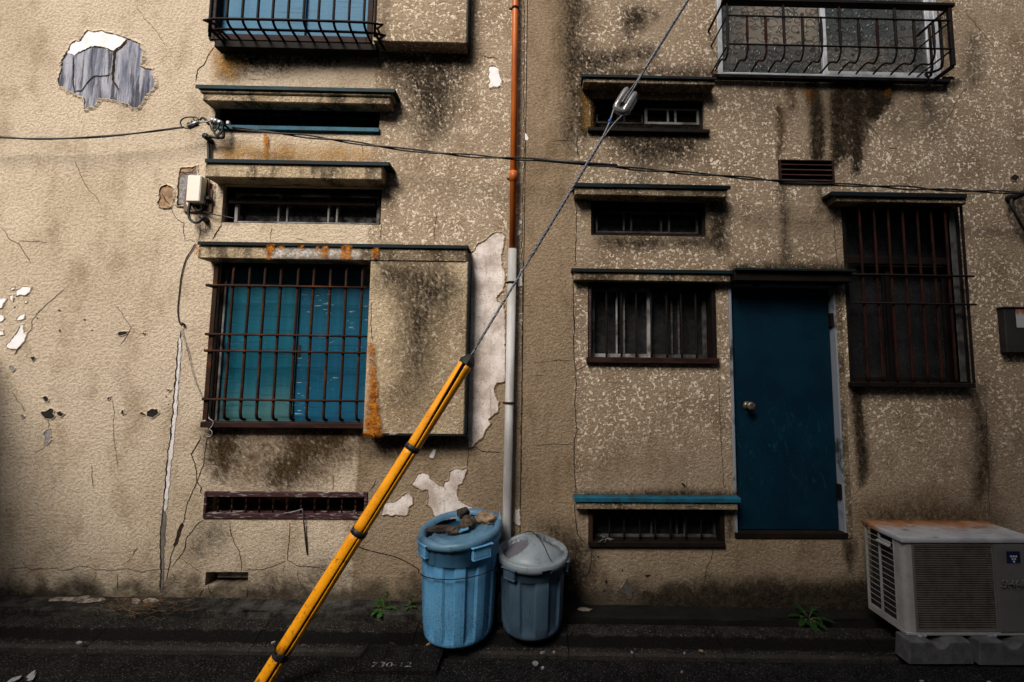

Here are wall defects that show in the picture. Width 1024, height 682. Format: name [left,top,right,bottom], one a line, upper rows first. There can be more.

spalling [55,27,159,113]
water stain [807,82,892,174]
spalling [156,164,216,210]
peeling [0,285,38,351]
spalling [465,220,524,450]
corrosion [364,342,381,436]
crack [9,331,215,598]
water stain [204,428,408,488]
spalling [380,447,475,520]
water stain [850,387,869,485]
water stain [971,387,991,498]
crack [229,523,323,595]